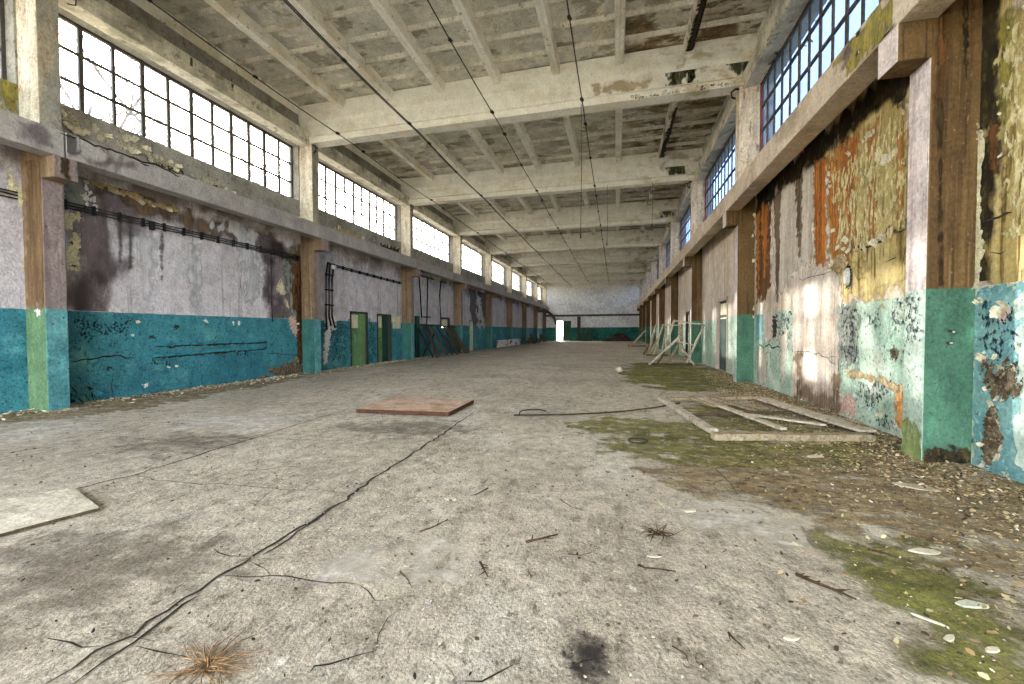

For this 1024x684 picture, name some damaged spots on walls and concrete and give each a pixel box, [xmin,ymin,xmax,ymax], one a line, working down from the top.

damp [843,43,852,69]
peeling [61,108,241,196]
damp [934,8,948,286]
damp [962,0,1024,285]
peeling [65,180,186,271]
damp [60,133,301,319]
flaking render [753,109,921,433]
peeling [972,5,1024,484]
crack [96,436,330,504]
crack [3,628,97,648]
crack [133,637,187,657]
crack [213,548,398,673]